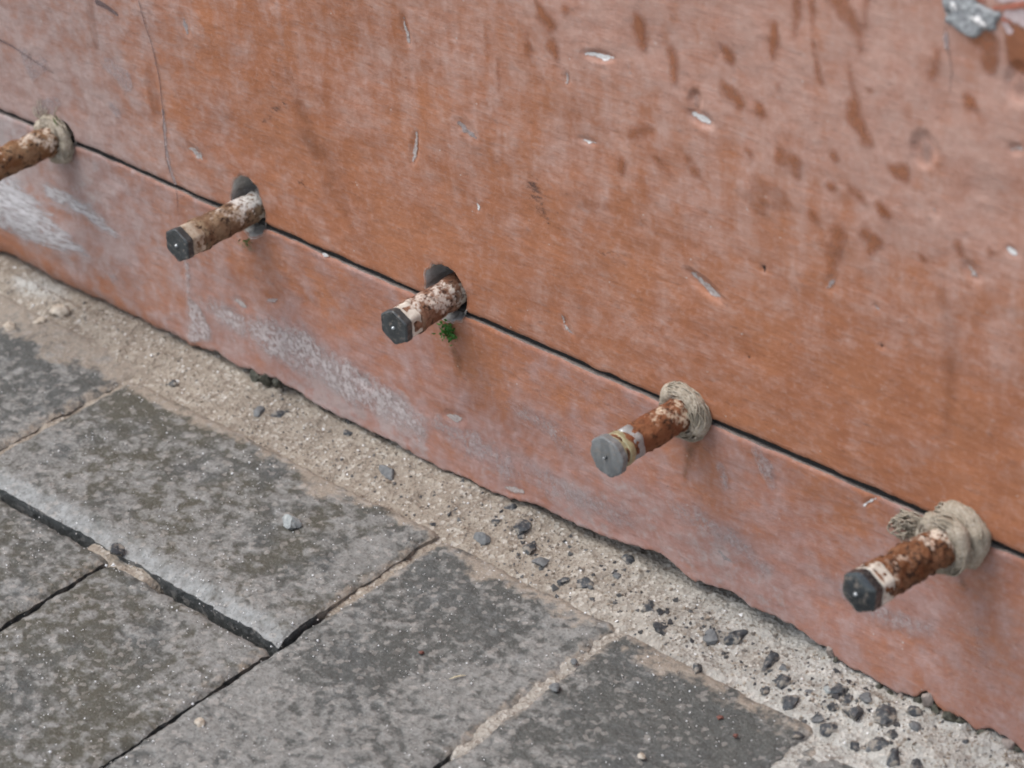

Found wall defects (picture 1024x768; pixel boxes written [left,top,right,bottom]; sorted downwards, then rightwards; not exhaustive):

spalling [942,0,1024,38]